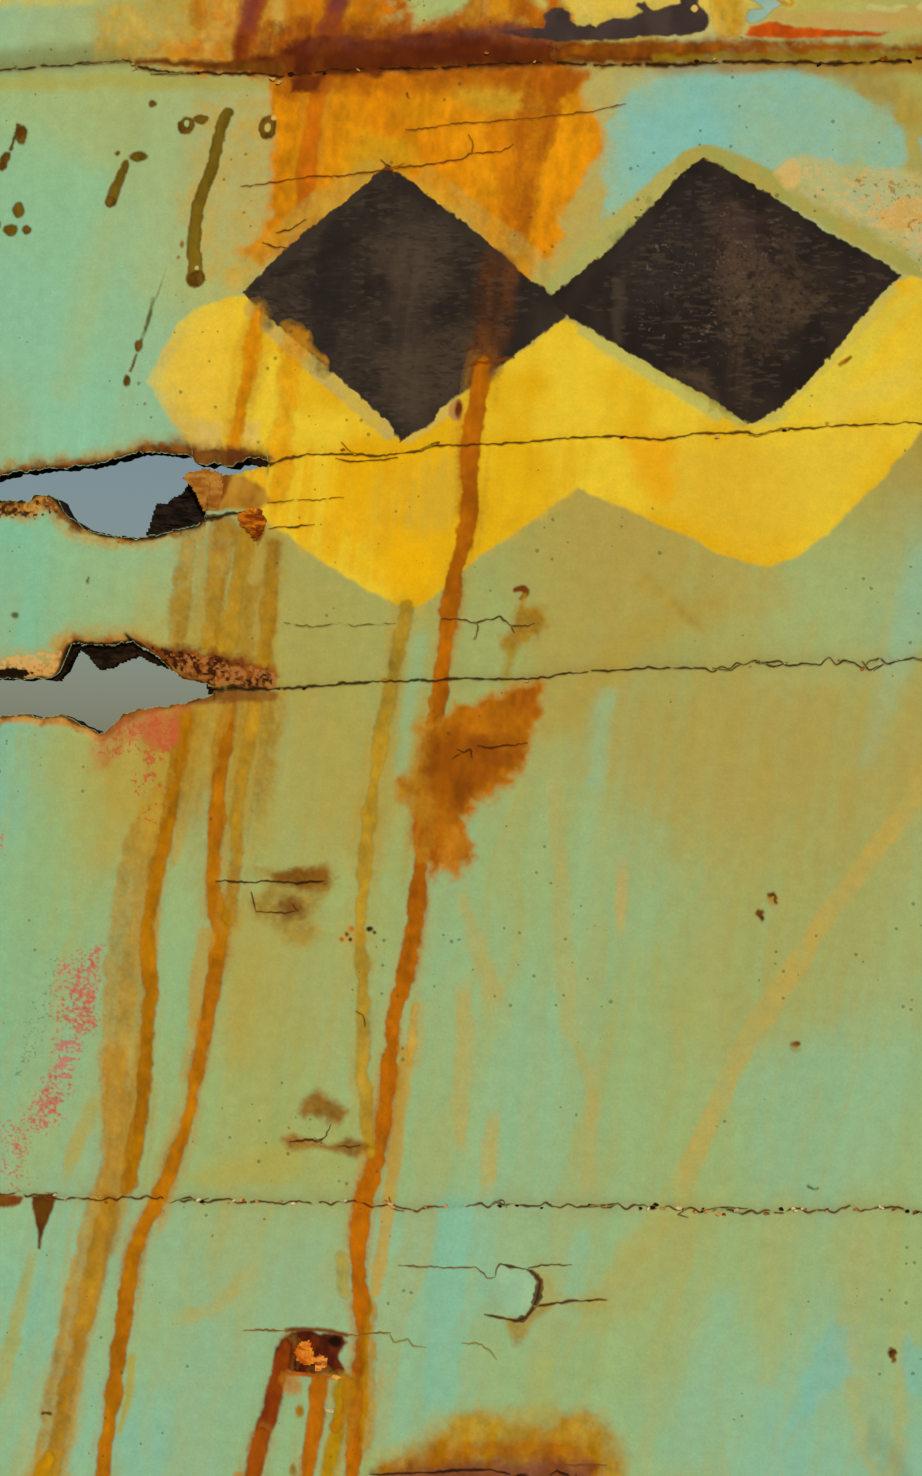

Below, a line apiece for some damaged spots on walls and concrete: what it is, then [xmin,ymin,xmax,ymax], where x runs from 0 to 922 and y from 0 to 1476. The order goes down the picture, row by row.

crack [0,52,922,85]
crack [240,103,626,188]
corrosion [85,0,922,511]
spalling [0,430,279,555]
crack [199,420,922,530]
spalling [0,616,284,828]
crack [440,615,536,638]
crack [208,656,922,694]
corrosion [18,346,639,1476]
crack [0,1189,922,1218]
crack [346,1263,608,1361]
crack [370,1462,607,1476]